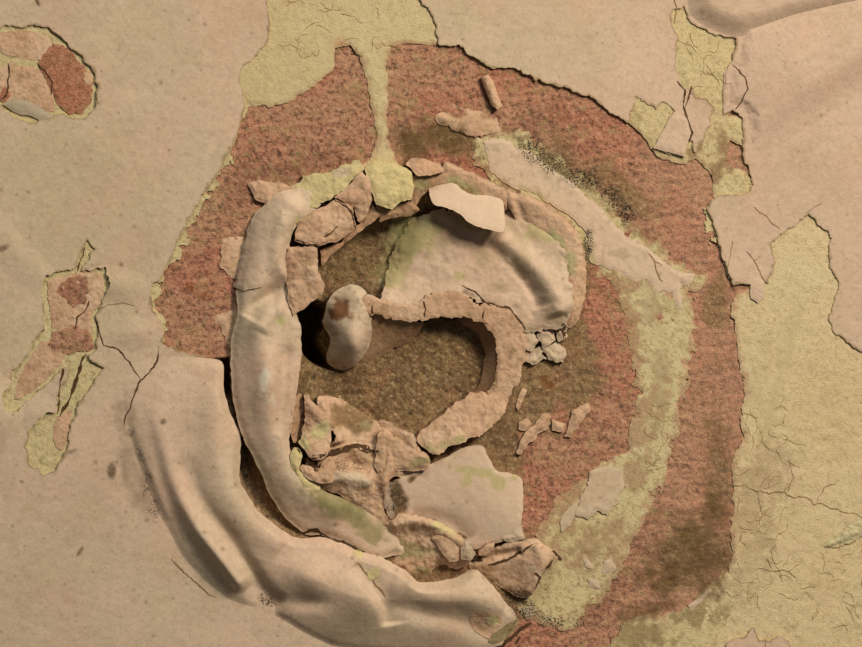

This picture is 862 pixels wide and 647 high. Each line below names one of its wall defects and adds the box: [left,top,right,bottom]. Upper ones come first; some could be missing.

peeling [0,25,98,123]
peeling [2,240,110,475]
crack [57,301,159,424]
spalling [150,0,753,647]
peeling [709,214,862,647]
crack [719,400,862,632]